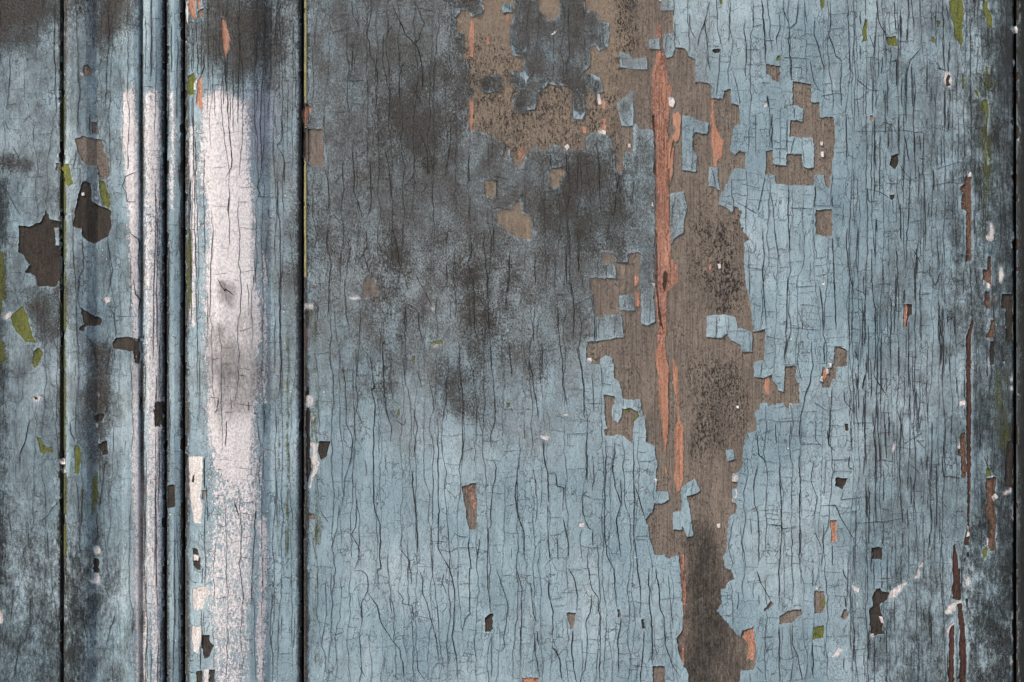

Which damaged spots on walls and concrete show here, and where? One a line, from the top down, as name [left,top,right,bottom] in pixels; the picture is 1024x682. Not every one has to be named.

peeling [18,122,112,287]
peeling [113,76,270,682]
crack [0,0,681,682]
water stain [259,0,655,417]
peeling [455,0,800,682]
peeling [764,587,826,624]
peeling [765,81,836,189]
peeling [815,209,833,236]
crack [654,0,1012,682]
peeling [820,346,847,388]
peeling [869,588,889,637]
peeling [948,319,973,682]